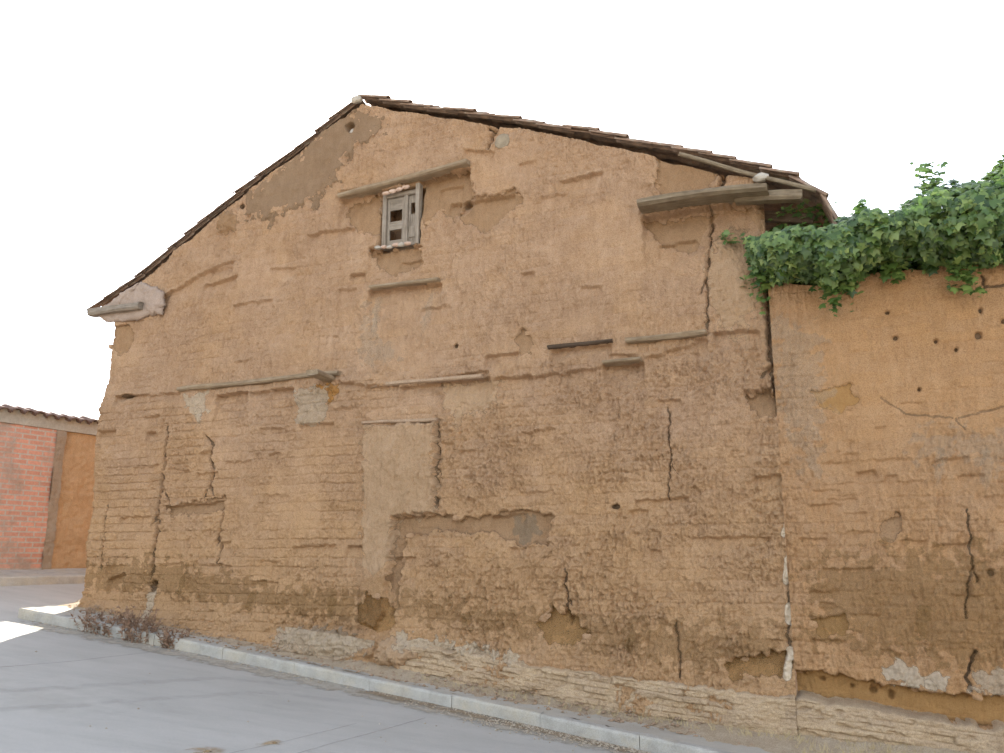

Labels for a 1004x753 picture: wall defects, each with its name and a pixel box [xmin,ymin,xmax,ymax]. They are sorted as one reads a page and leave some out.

crack [701,174,726,330]
crack [760,294,775,392]
crack [150,426,170,579]
crack [204,435,215,498]
crack [667,407,678,500]
spalling [358,509,555,639]
spalling [537,606,592,646]
spalling [724,649,787,681]
crack [781,525,794,681]
spalling [796,658,1004,726]
crack [964,649,978,692]
crack [964,508,979,619]